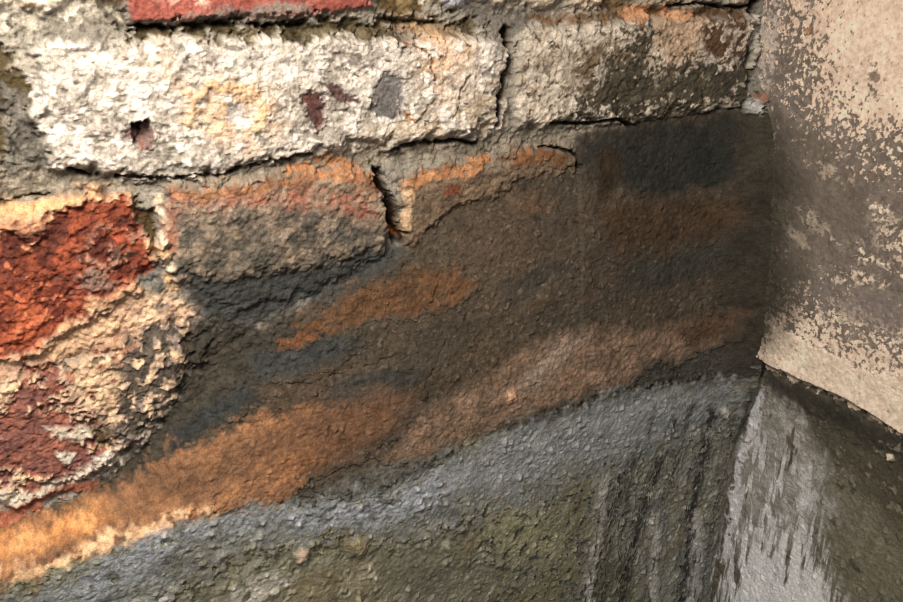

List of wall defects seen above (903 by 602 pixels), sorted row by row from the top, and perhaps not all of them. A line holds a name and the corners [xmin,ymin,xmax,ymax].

crack [64,150,318,182]
crack [122,15,310,36]
crack [371,13,514,241]
leakage [546,8,757,207]
spalling [0,181,385,525]
leakage [88,195,479,488]
leakage [612,81,903,602]
leakage [0,365,762,602]